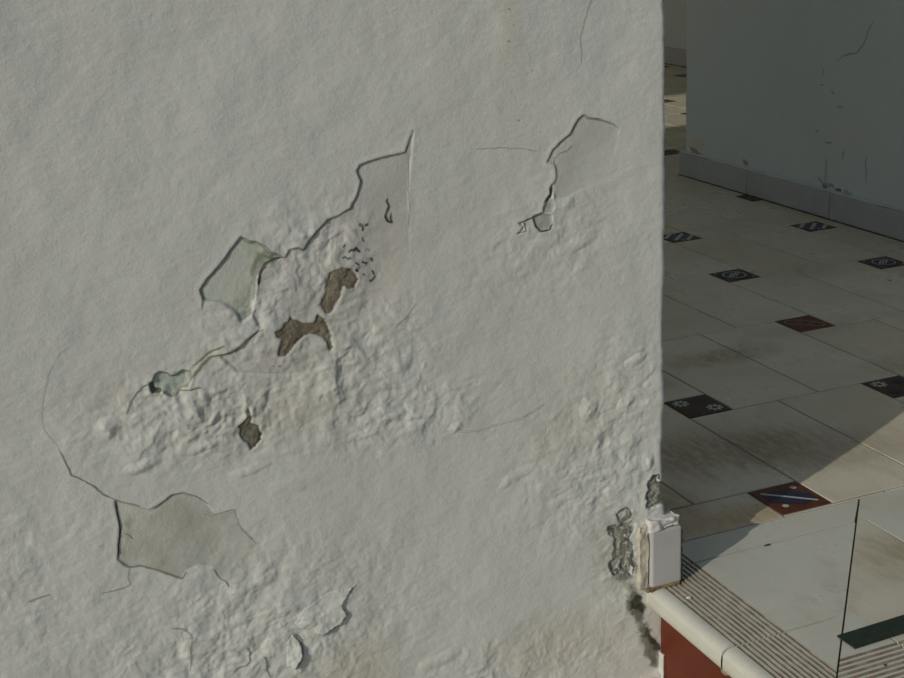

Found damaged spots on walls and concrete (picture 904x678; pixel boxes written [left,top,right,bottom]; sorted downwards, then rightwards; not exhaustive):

peeling [517,114,618,234]
peeling [200,129,414,373]
crack [58,449,115,500]
peeling [149,370,191,397]
flaking render [238,409,262,449]
flaking render [646,474,660,507]
peeling [101,493,255,594]
water stain [615,516,660,667]